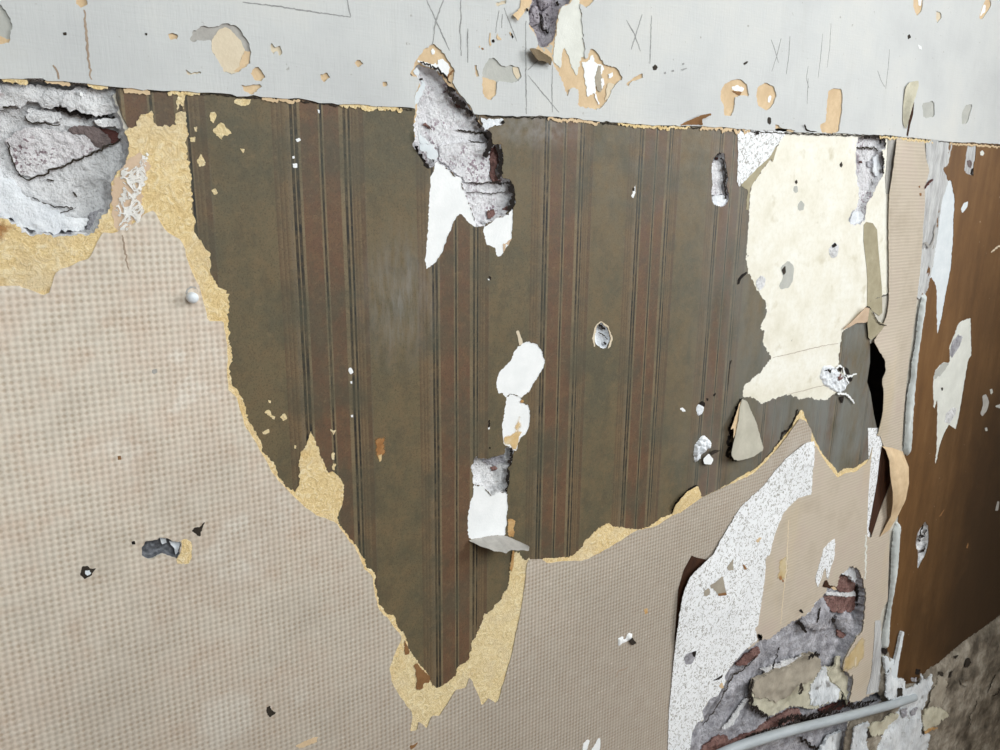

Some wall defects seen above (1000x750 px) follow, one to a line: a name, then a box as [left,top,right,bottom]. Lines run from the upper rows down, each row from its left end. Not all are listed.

spalling [0,79,129,238]
peeling [190,24,265,95]
spalling [413,61,515,269]
spalling [528,0,593,57]
spalling [711,152,729,207]
peeling [720,79,776,116]
spalling [964,145,984,175]
flaking render [743,88,890,428]
peeling [930,180,968,333]
flaking render [467,331,545,539]
peeling [933,318,972,463]
peeling [980,389,1000,416]